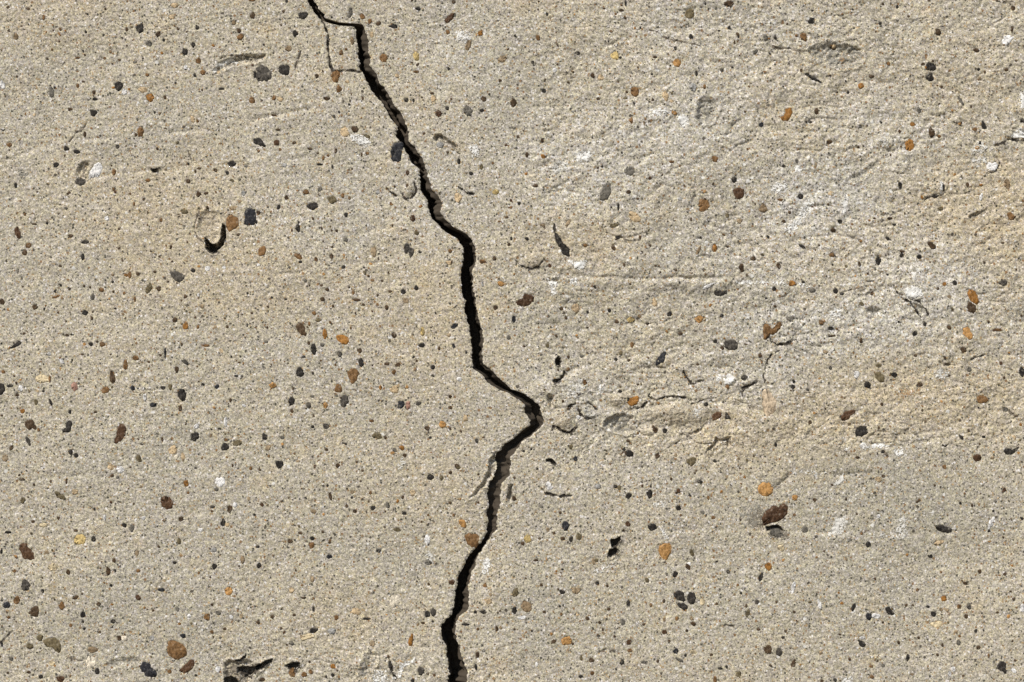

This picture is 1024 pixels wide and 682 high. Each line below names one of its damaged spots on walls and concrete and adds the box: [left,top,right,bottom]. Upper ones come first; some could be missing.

crack [308,0,598,682]